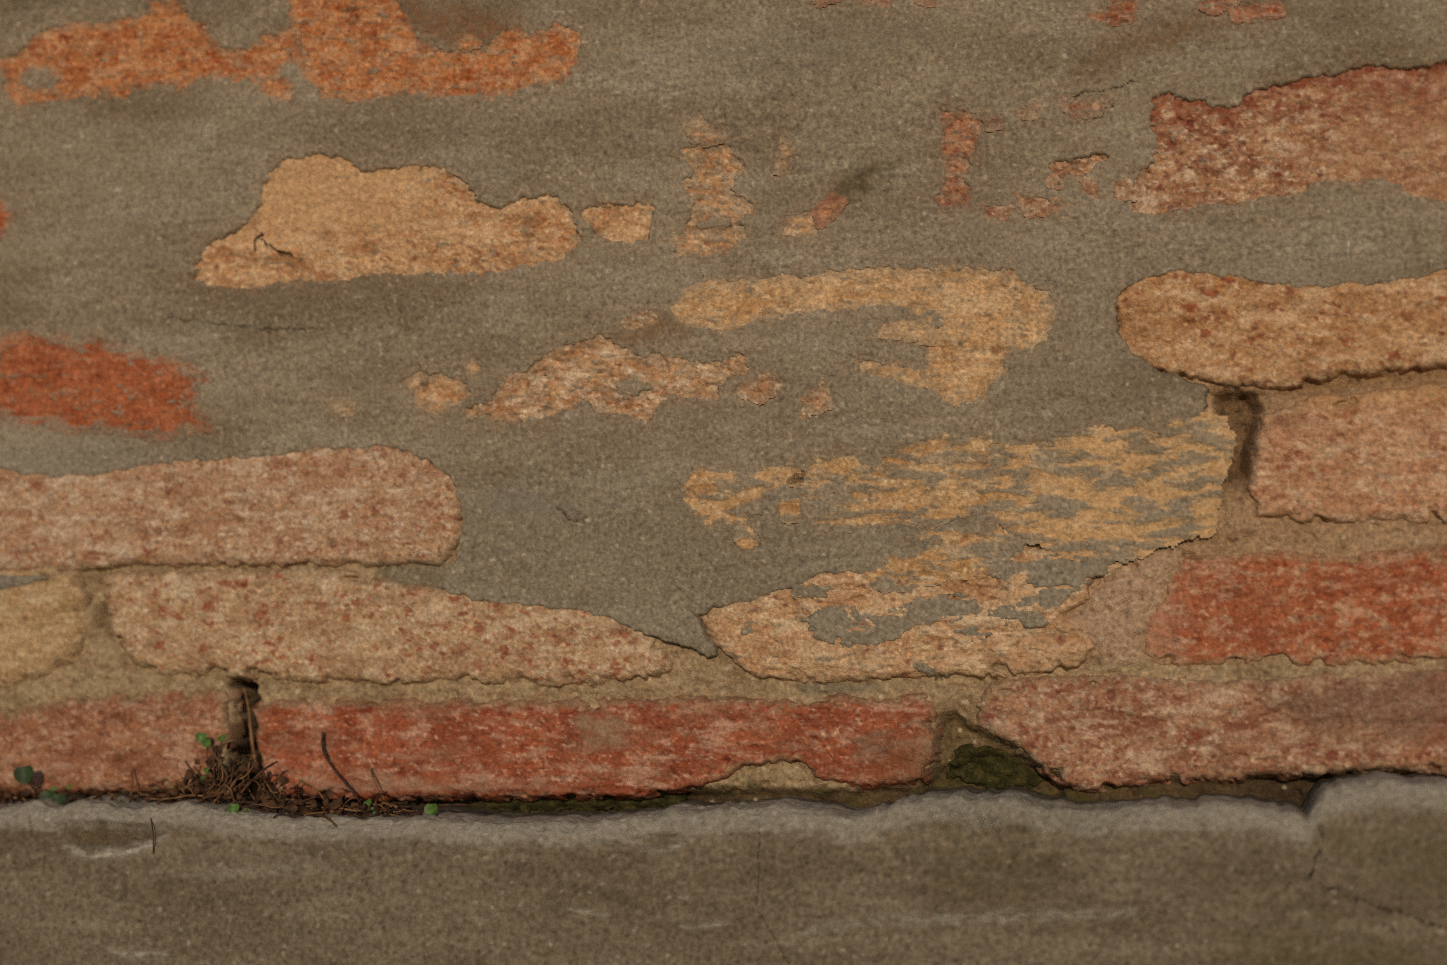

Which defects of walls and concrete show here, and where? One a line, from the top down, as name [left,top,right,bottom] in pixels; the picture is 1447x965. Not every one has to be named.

peeling [0,0,582,107]
peeling [1086,0,1140,26]
peeling [1199,0,1286,24]
peeling [195,154,655,289]
peeling [668,115,759,258]
peeling [782,193,848,238]
peeling [934,62,1447,221]
peeling [0,330,215,442]
peeling [402,263,1058,423]
peeling [683,462,804,549]
peeling [862,521,1024,594]
crack [1306,811,1447,930]